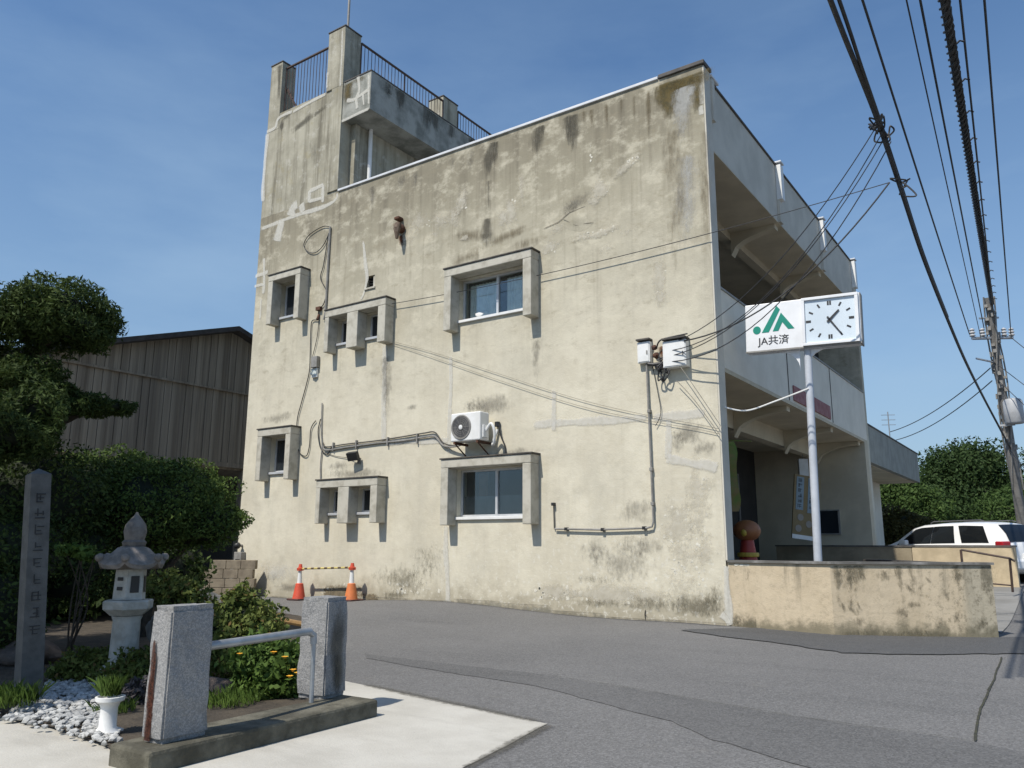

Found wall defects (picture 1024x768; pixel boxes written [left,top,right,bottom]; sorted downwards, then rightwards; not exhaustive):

water stain [647,68,709,119]
water stain [566,113,592,141]
water stain [485,142,497,170]
water stain [463,219,513,239]
rust [144,640,156,741]